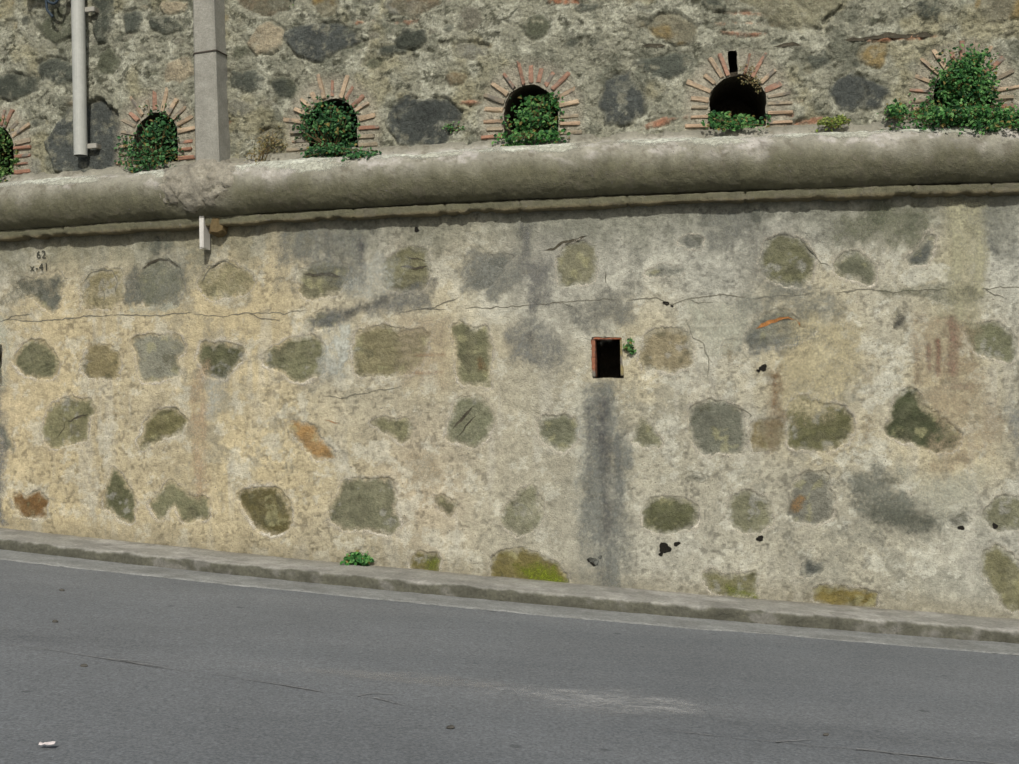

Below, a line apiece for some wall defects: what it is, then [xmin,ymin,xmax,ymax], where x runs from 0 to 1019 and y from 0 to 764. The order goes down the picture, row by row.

crack [400,257,426,269]
crack [406,272,810,376]
crack [839,286,1019,298]
leakage [578,382,633,587]